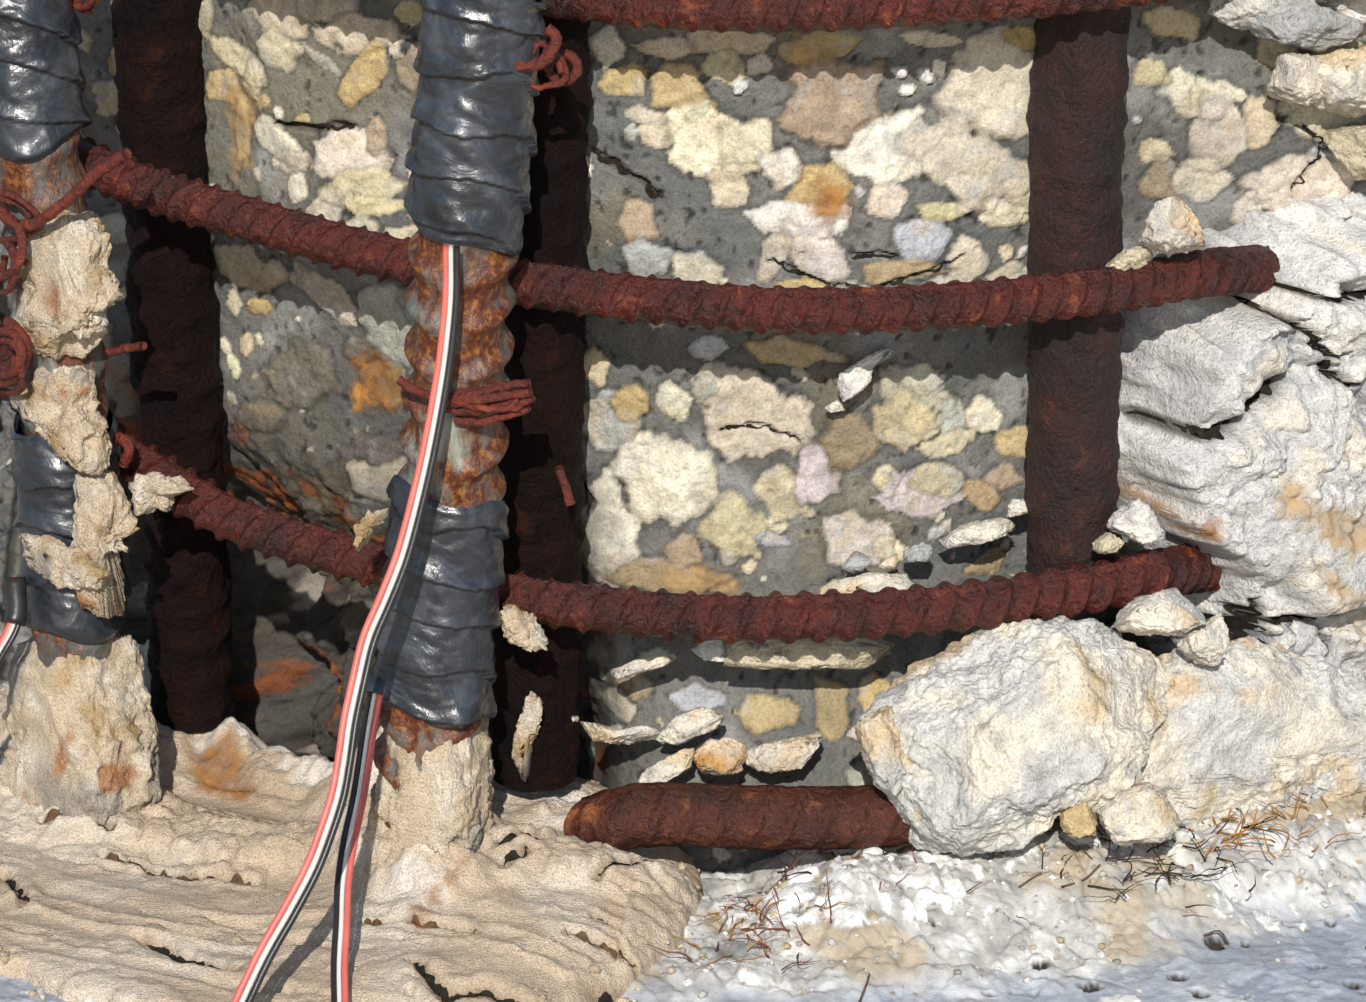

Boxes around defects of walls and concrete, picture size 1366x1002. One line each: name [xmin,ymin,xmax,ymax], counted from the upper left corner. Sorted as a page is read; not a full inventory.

spalling [198,0,423,239]
spalling [583,17,1037,288]
rust [816,186,844,217]
spalling [1120,0,1366,258]
spalling [210,231,414,543]
spalling [249,556,380,762]
spalling [572,626,981,789]
spalling [580,316,1030,597]
spalling [1058,606,1157,657]
rust [1184,523,1217,539]